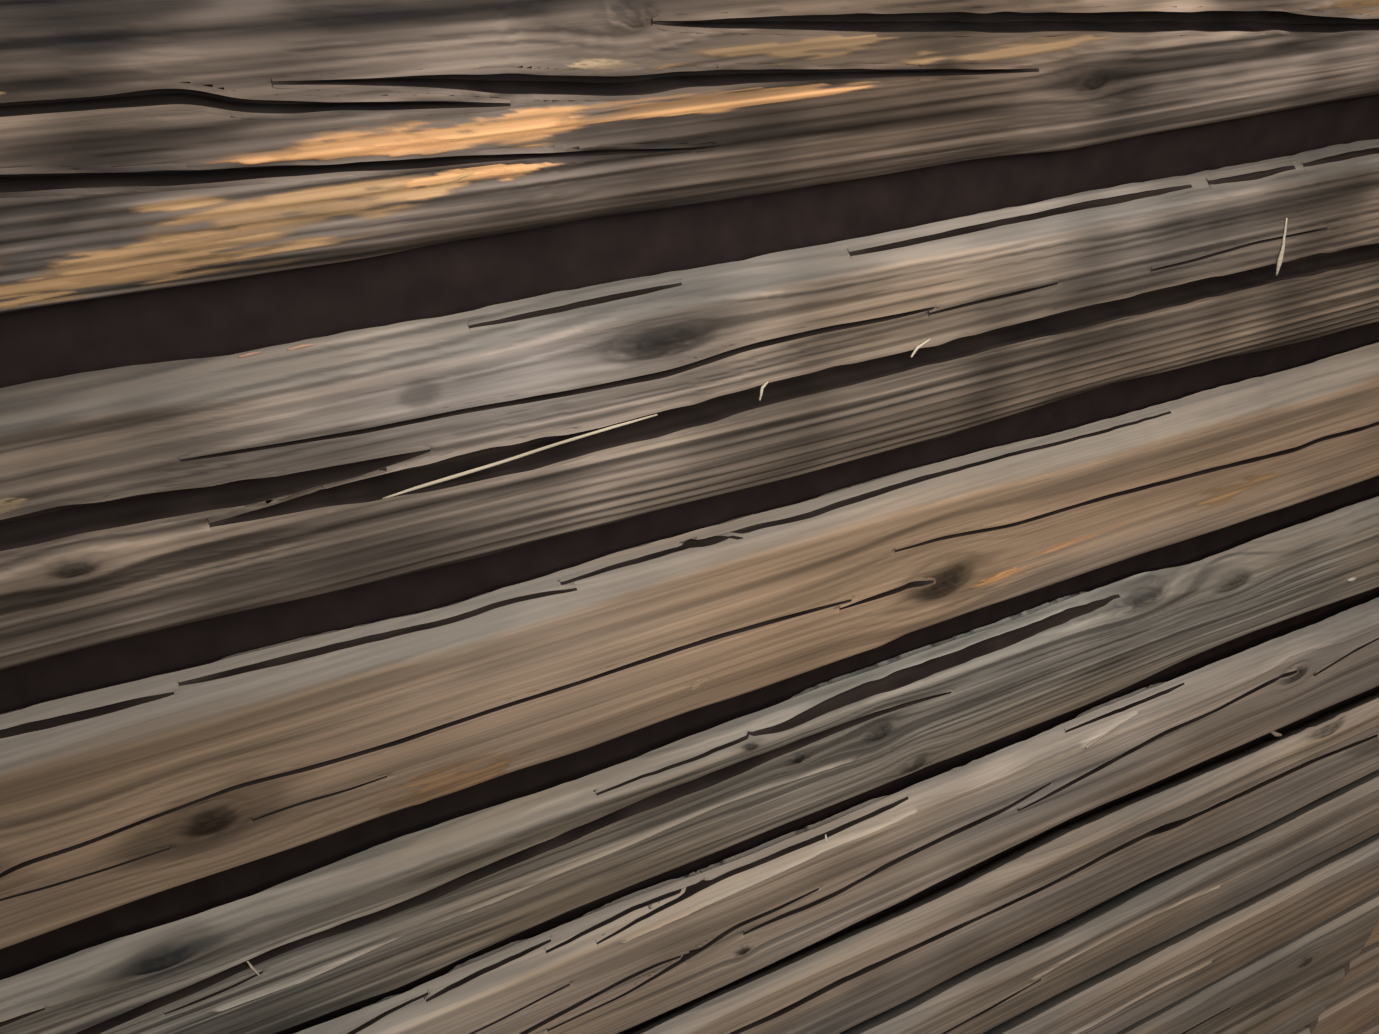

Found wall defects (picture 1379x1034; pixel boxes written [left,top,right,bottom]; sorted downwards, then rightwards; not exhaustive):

crack [0,143,716,198]
crack [0,6,1379,124]
crack [847,143,1379,260]
crack [0,225,1379,556]
crack [0,409,1379,904]
crack [0,591,1379,1034]